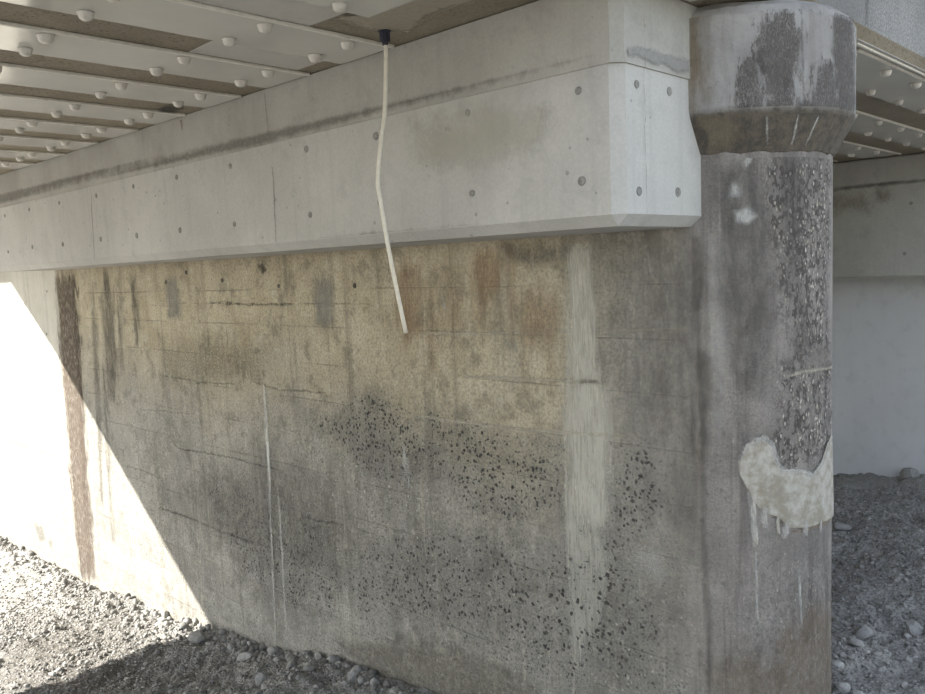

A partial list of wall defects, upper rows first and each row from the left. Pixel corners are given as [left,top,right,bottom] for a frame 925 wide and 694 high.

water stain [0,275,94,579]
water stain [96,274,115,398]
water stain [565,247,608,671]
spalling [740,158,834,546]